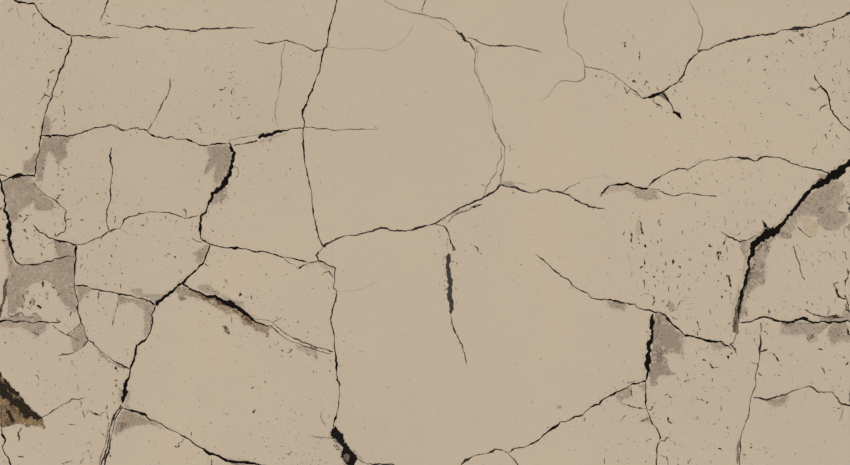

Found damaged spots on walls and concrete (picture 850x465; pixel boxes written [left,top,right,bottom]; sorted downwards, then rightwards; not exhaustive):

peeling [3,115,73,223]
peeling [199,145,232,217]
peeling [1,241,92,338]
peeling [732,174,850,335]
spalling [0,377,46,428]
crack [1,415,50,465]